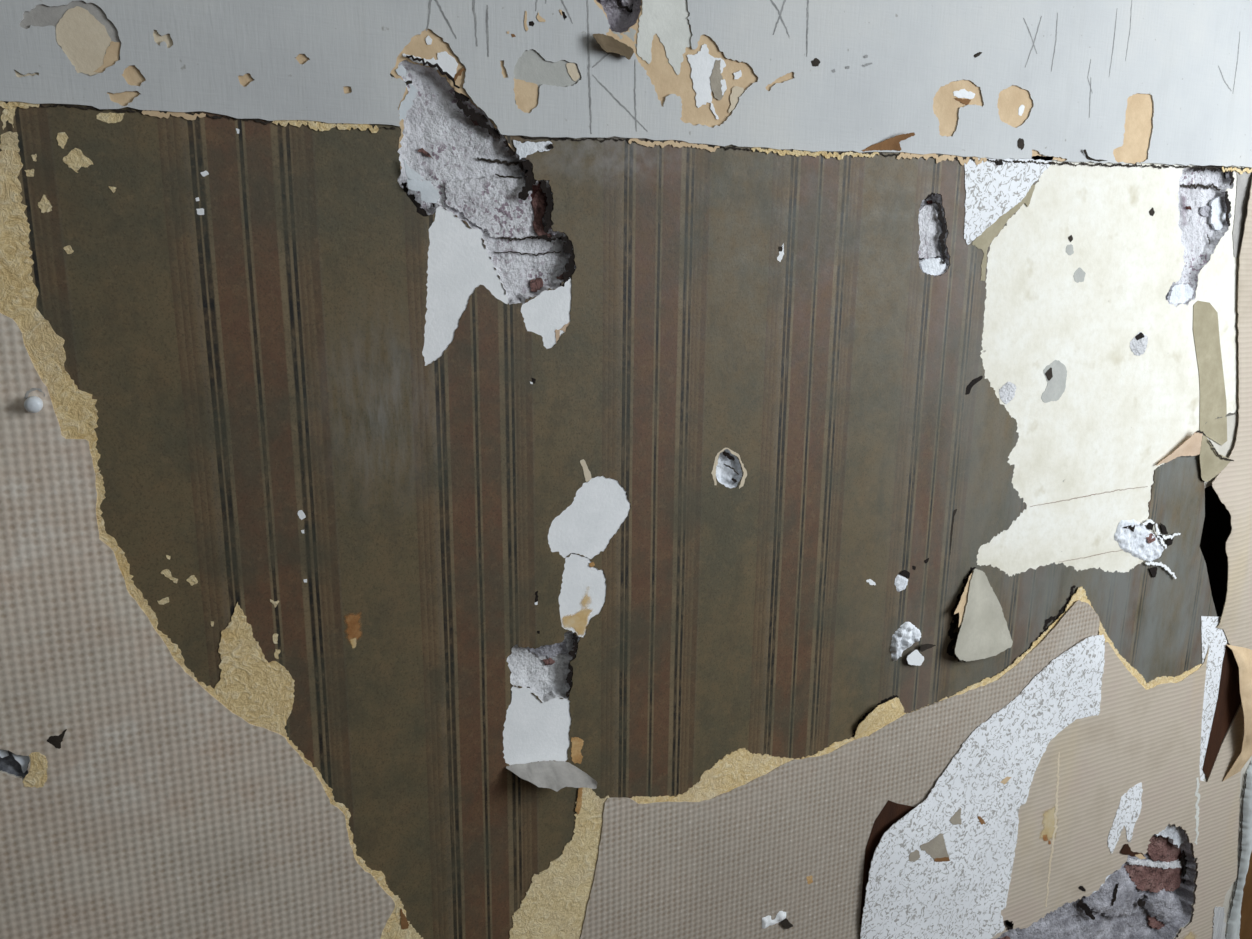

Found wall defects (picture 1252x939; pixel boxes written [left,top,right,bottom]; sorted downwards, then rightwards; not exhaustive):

peeling [19,1,146,106]
peeling [153,30,173,48]
peeling [238,73,254,87]
spalling [596,0,641,47]
peeling [765,72,793,91]
peeling [933,80,1033,137]
spalling [397,49,581,366]
spalling [918,193,950,277]
flaking render [977,93,1246,579]
spalling [1200,485,1231,617]
flaking render [503,459,631,765]